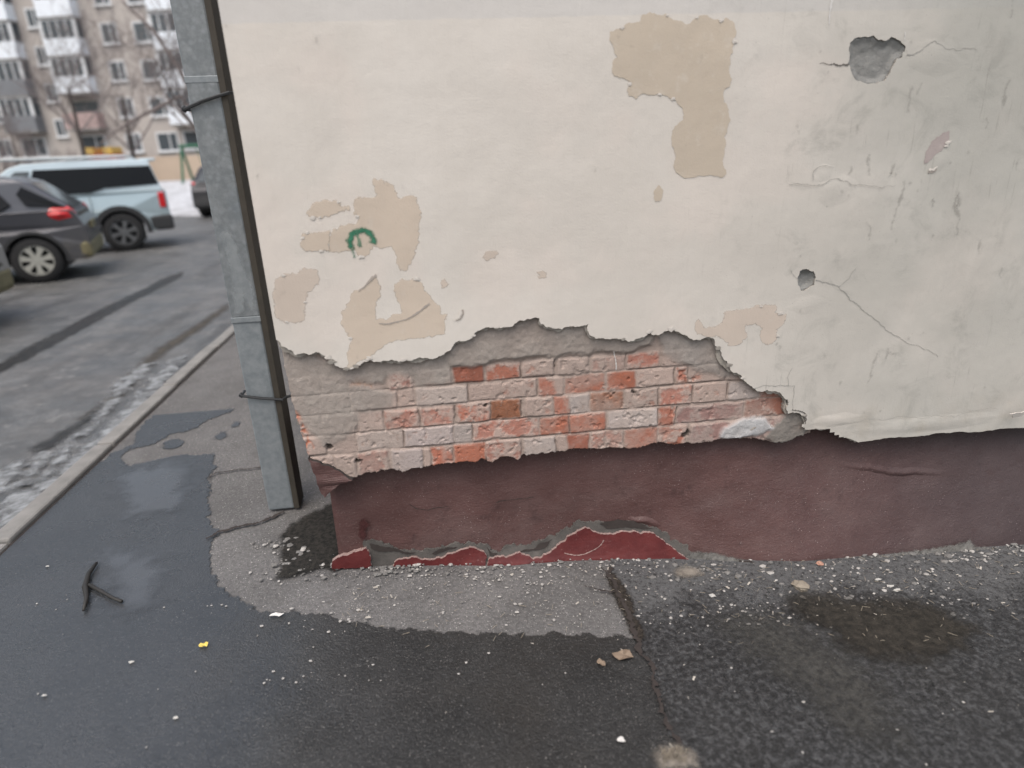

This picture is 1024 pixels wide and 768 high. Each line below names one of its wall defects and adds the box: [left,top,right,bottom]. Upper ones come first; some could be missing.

peeling [609,12,738,178]
spalling [848,36,905,84]
peeling [924,131,952,173]
spalling [272,178,826,477]
crack [791,268,938,357]
peeling [331,519,693,569]